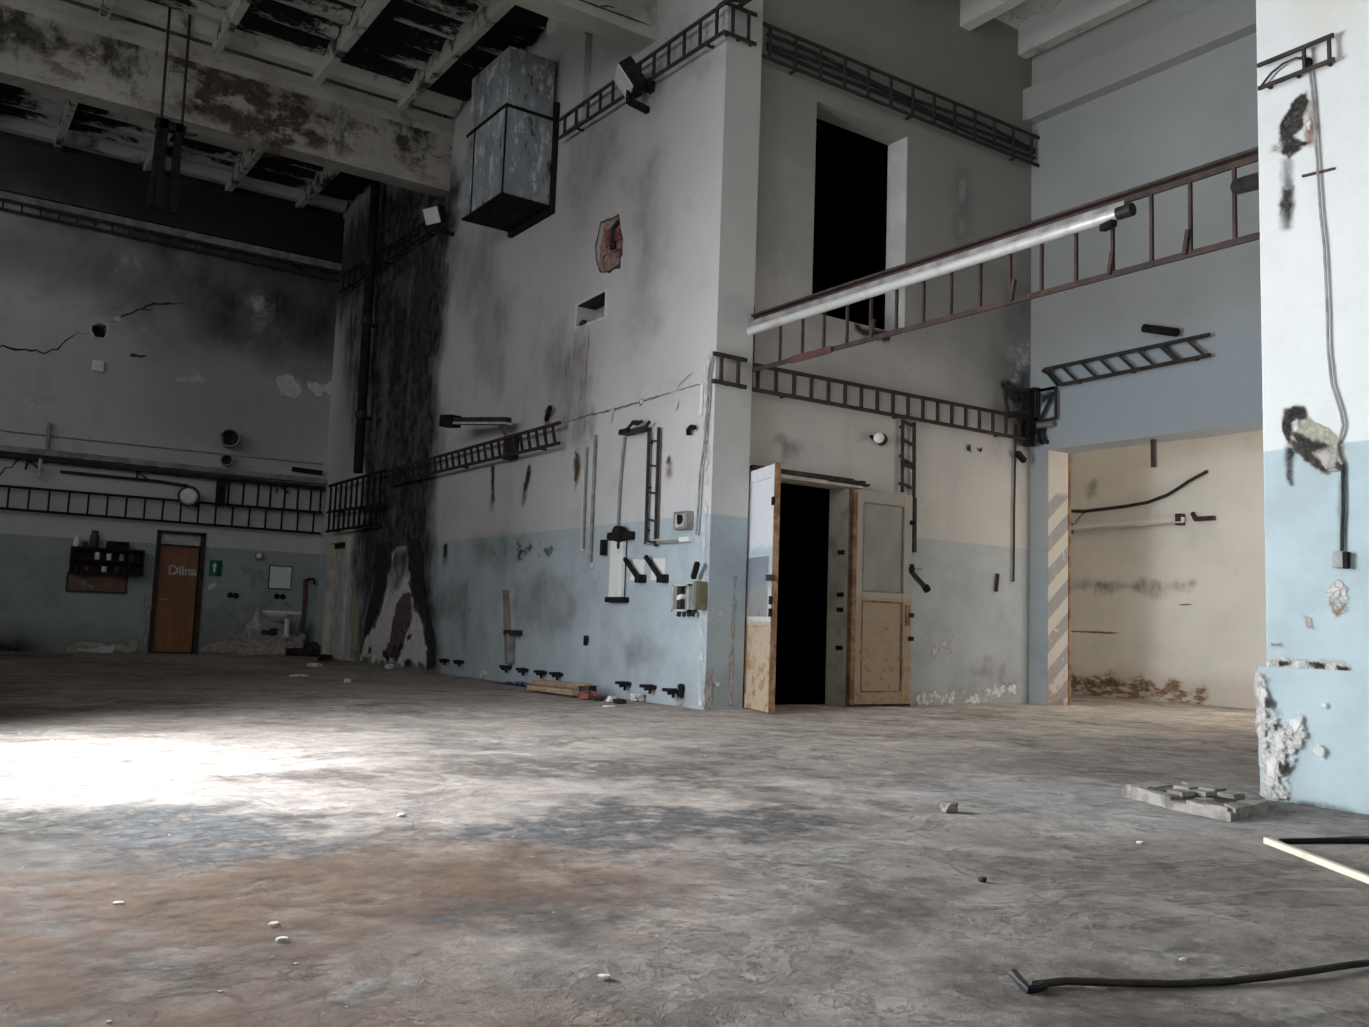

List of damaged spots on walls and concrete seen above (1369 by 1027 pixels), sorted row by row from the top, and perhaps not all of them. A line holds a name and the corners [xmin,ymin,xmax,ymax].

mould [0,6,62,54]
mould [80,38,139,78]
damp [174,56,328,157]
damp [388,119,430,151]
flaking render [1280,94,1318,158]
flaking render [1279,175,1293,227]
spalling [595,214,623,273]
crack [0,302,185,354]
flaking render [1281,406,1346,474]
damp [350,543,388,658]
flaking render [360,546,427,667]
flaking render [1254,644,1350,800]